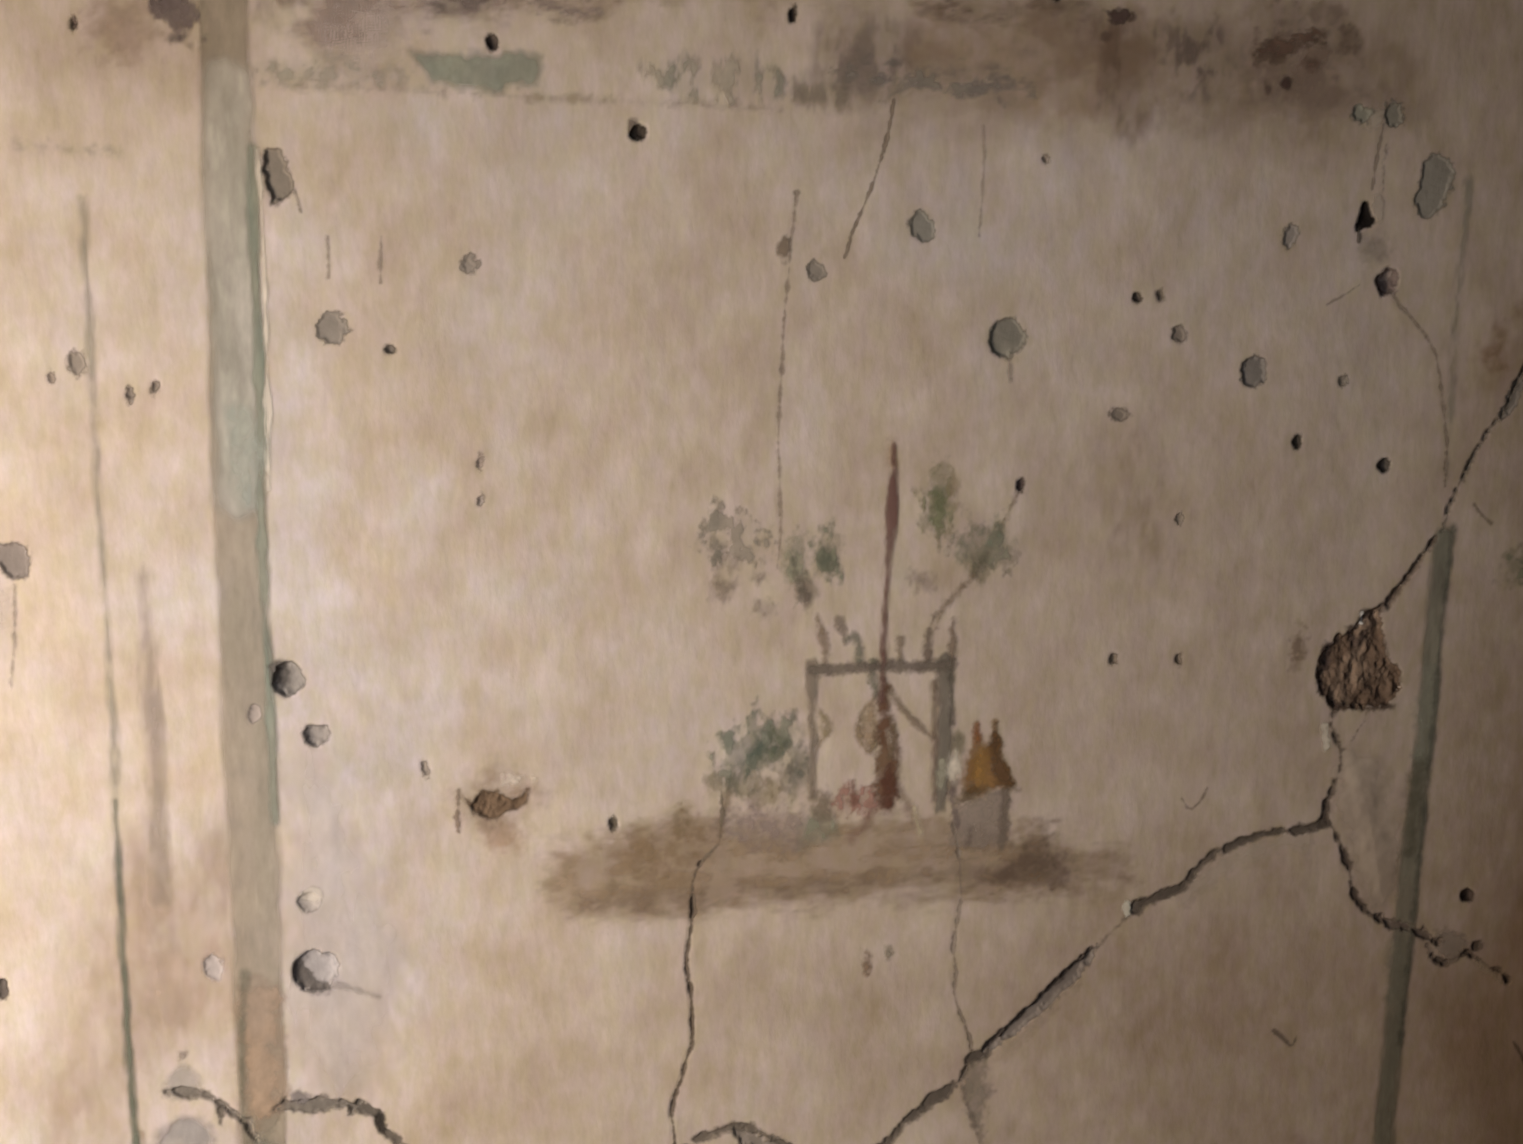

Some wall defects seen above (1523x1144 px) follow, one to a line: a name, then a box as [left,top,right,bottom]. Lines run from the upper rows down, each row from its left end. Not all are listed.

water stain [305,0,505,44]
water stain [1101,9,1134,67]
water stain [1253,17,1345,95]
spalling [262,148,301,211]
crack [1359,291,1523,622]
spalling [0,542,30,580]
spalling [1316,608,1401,711]
spalling [454,776,529,832]
crack [1123,710,1510,983]
crack [669,797,791,1144]
crack [881,901,1098,1144]
crack [160,1053,402,1144]